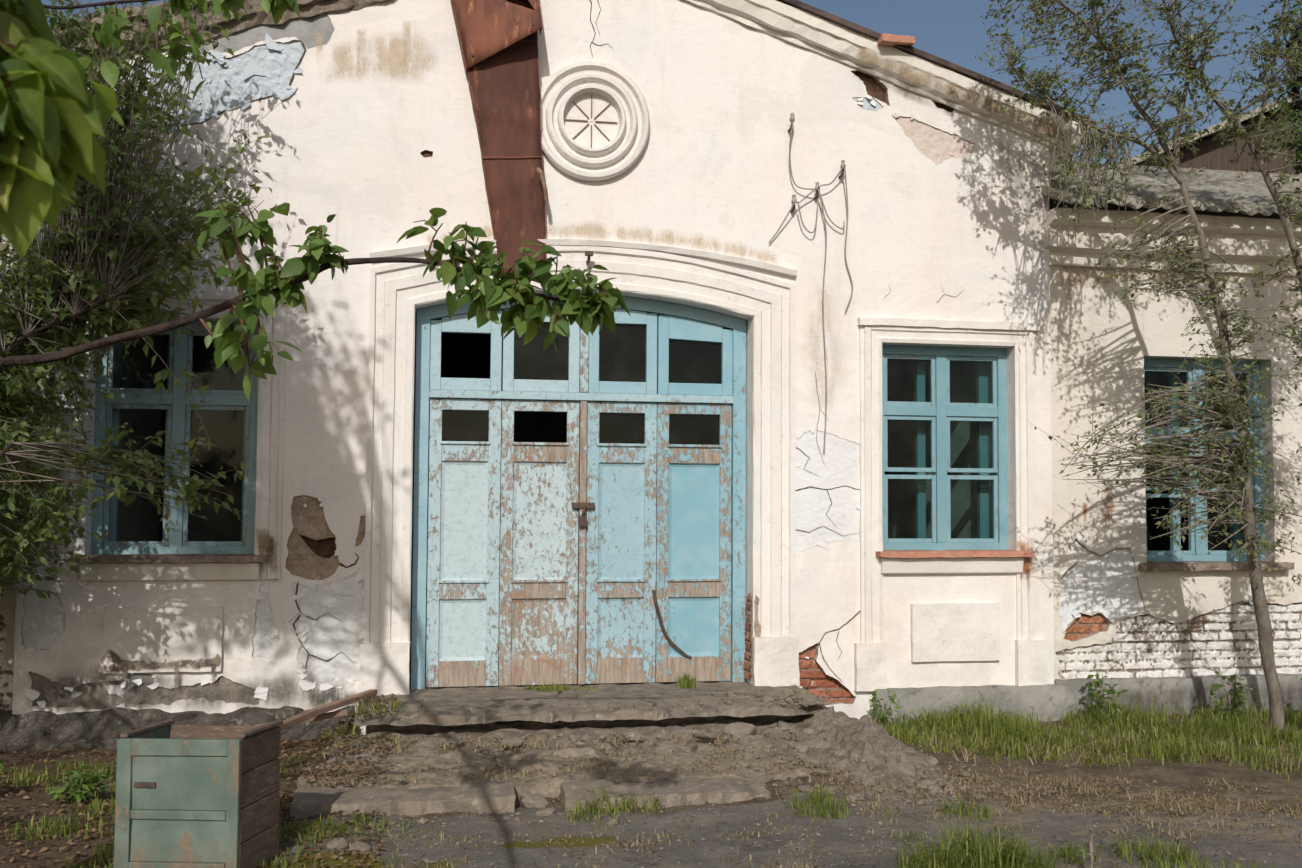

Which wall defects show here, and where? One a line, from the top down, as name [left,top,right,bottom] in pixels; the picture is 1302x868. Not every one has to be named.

flaking render [111,14,334,133]
crack [589,0,612,57]
flaking render [851,70,975,164]
crack [795,373,860,536]
flaking render [0,547,269,710]
peeling [252,495,366,691]
crack [293,582,353,668]
flaking render [744,592,761,681]
flaking render [798,642,856,705]
flaking render [1056,599,1302,679]